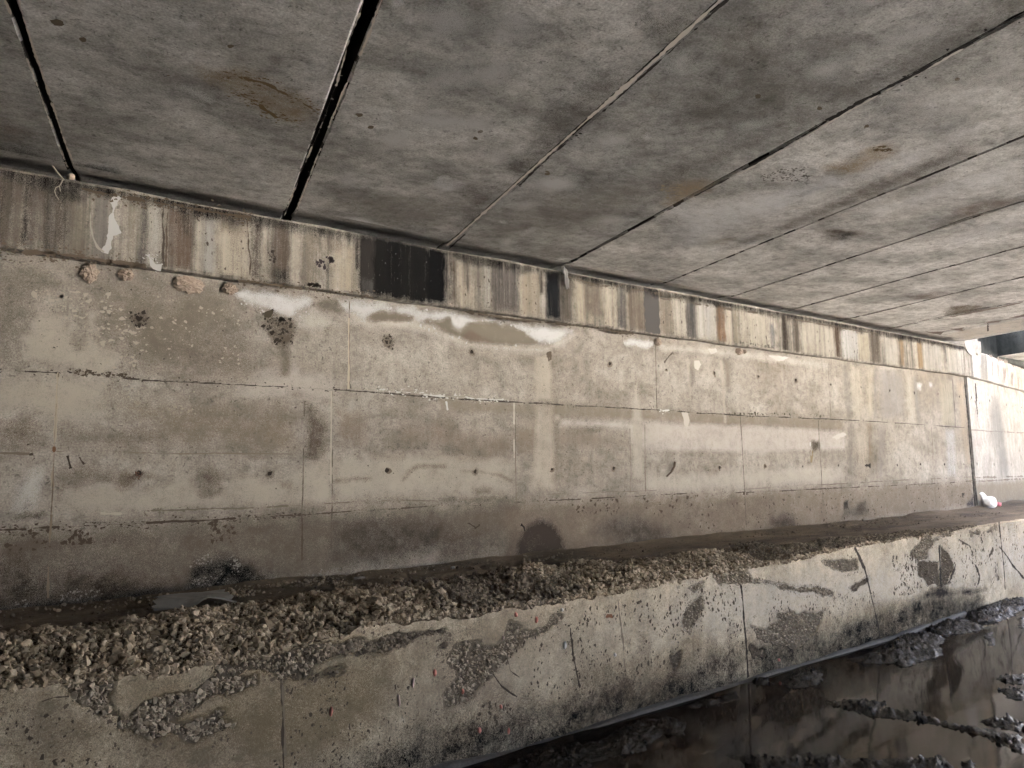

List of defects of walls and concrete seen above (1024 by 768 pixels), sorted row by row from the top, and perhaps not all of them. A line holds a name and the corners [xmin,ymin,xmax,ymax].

peeling [19,289,241,376]
hole [261,309,296,346]
damp [0,0,1024,577]